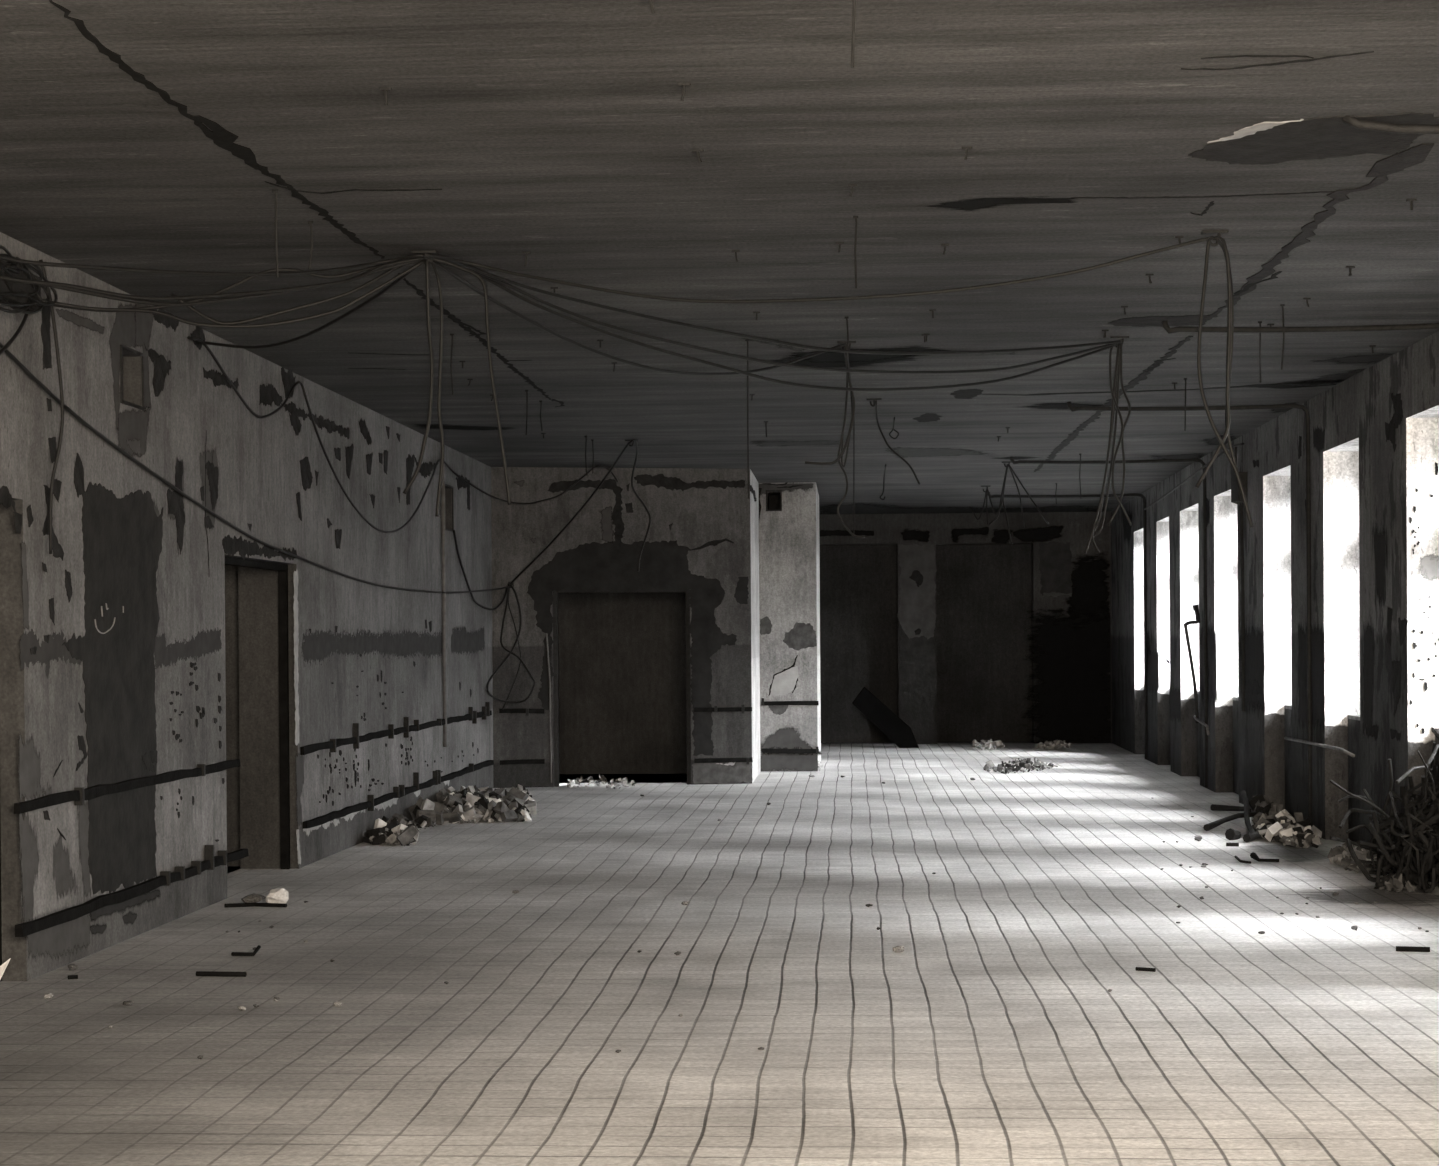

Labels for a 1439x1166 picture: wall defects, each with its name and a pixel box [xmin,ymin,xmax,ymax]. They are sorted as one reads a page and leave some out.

crack [1181,51,1374,70]
spalling [1188,112,1439,165]
crack [49,0,565,407]
crack [1034,143,1434,472]
peeling [334,418,439,505]
flaking render [0,453,222,894]
peeling [200,456,485,745]
peeling [296,749,398,864]
flaking render [385,736,479,786]
flaking render [527,540,749,756]
flaking render [768,705,788,715]
flaking render [760,616,817,651]